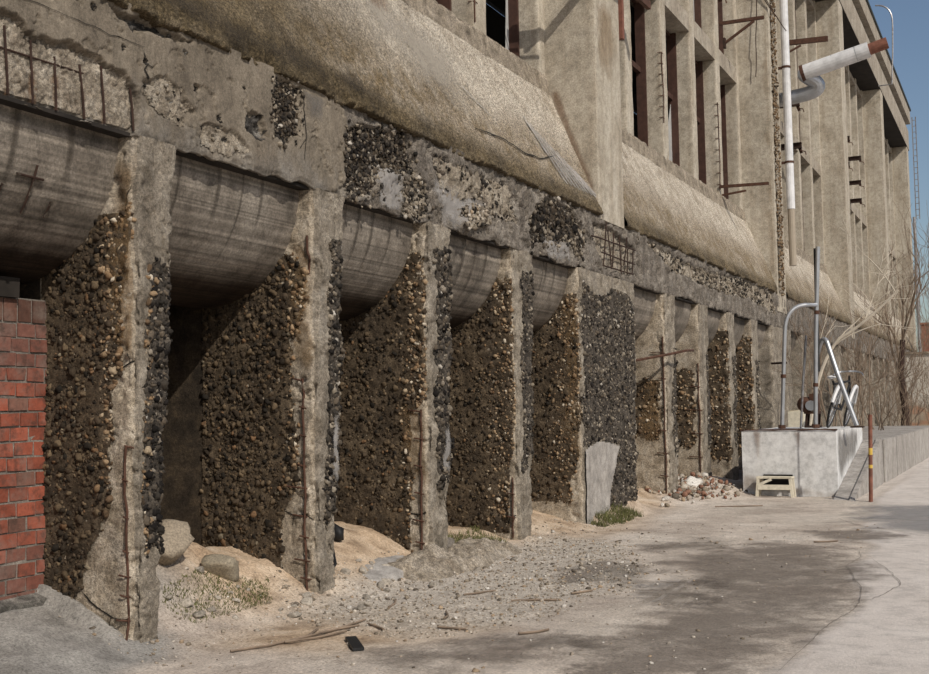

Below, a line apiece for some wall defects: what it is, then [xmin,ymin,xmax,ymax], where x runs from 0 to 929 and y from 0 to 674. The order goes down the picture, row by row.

spalling [0,16,135,131]
crack [28,0,153,81]
spalling [118,18,171,39]
spalling [143,77,193,127]
spalling [342,119,517,231]
spalling [523,115,596,197]
spalling [647,0,785,315]
spalling [528,194,636,275]
spalling [41,202,174,641]
spalling [199,235,312,591]
spalling [322,239,761,553]
crack [777,551,924,672]